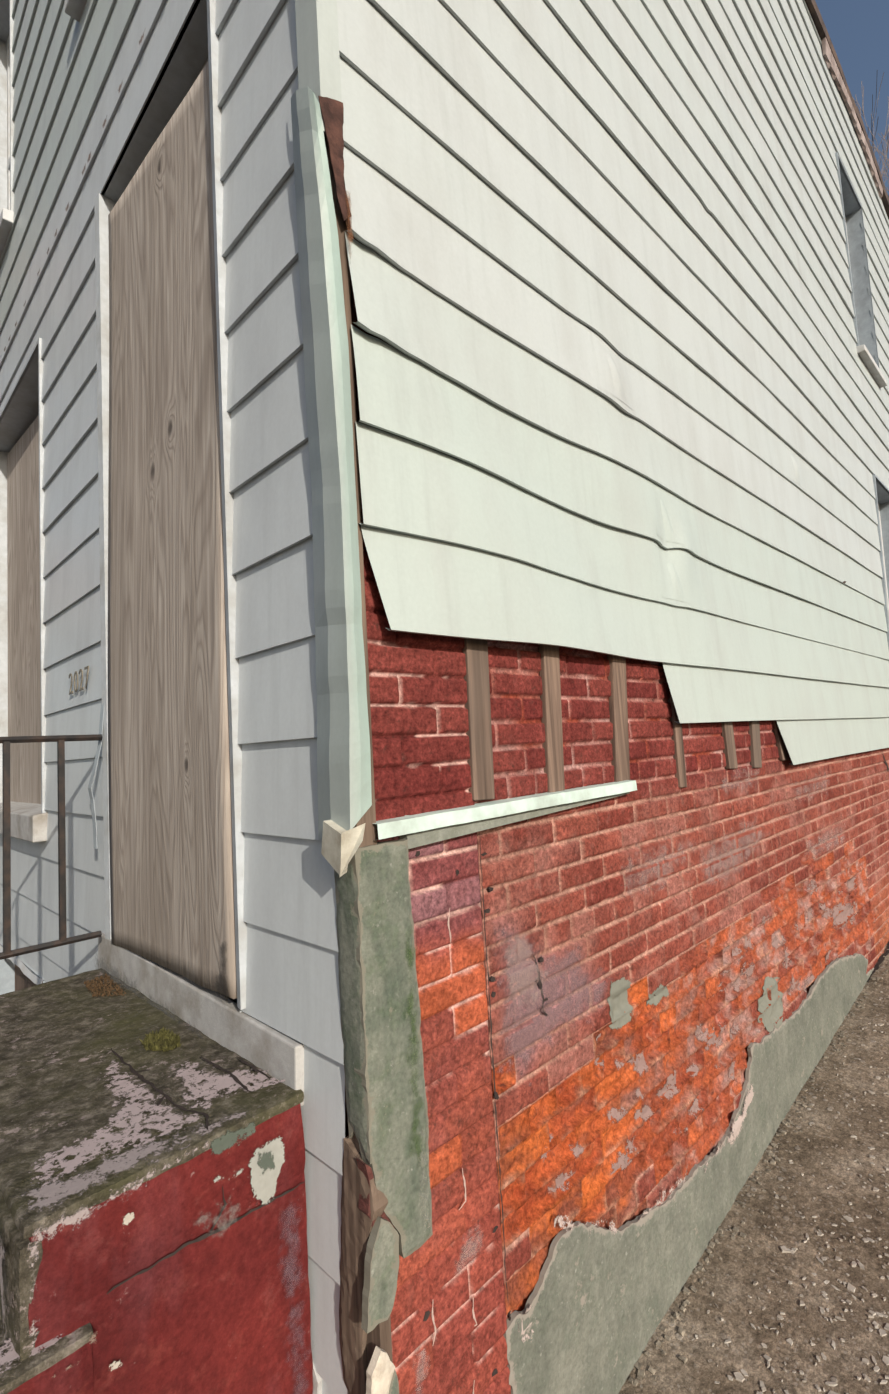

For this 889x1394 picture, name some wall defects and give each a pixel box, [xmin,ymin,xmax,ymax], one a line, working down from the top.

peeling [0,1242,62,1374]
peeling [22,1060,285,1267]
flaking render [334,839,433,1394]
flaking render [491,839,889,1394]